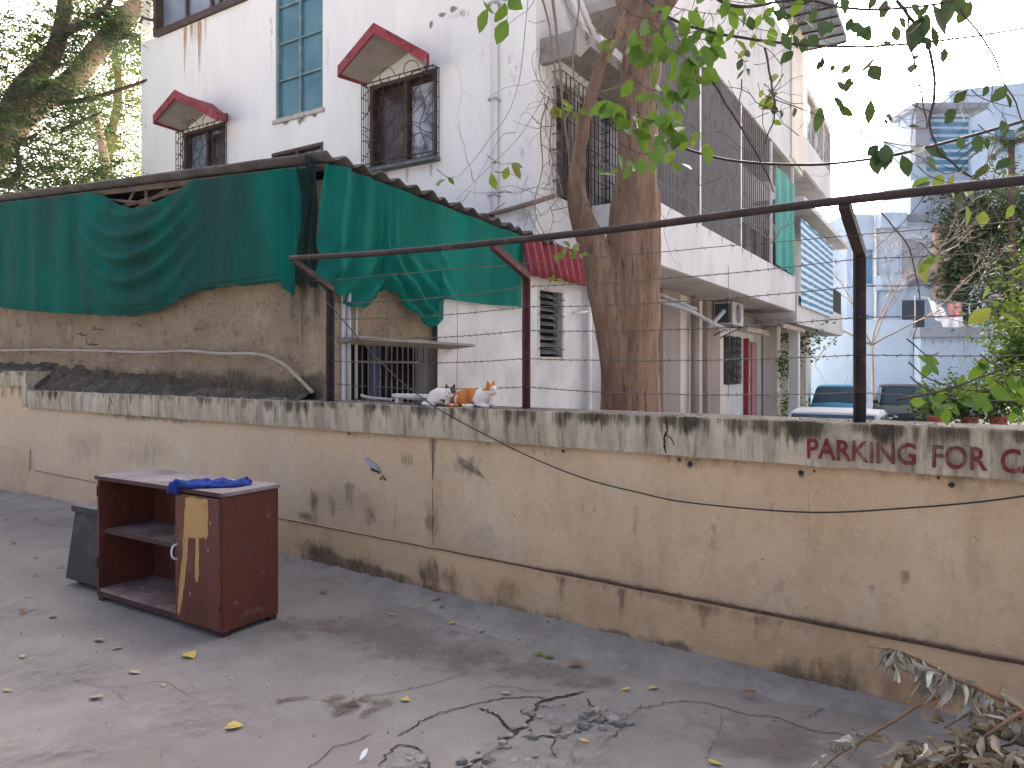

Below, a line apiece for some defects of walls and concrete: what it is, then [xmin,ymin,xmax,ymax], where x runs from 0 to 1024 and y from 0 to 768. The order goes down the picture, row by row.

rust [184,22,206,67]
water stain [451,408,534,424]
crack [663,416,674,453]
water stain [628,416,821,442]
water stain [851,424,970,445]
water stain [303,546,403,583]
crack [309,671,844,768]